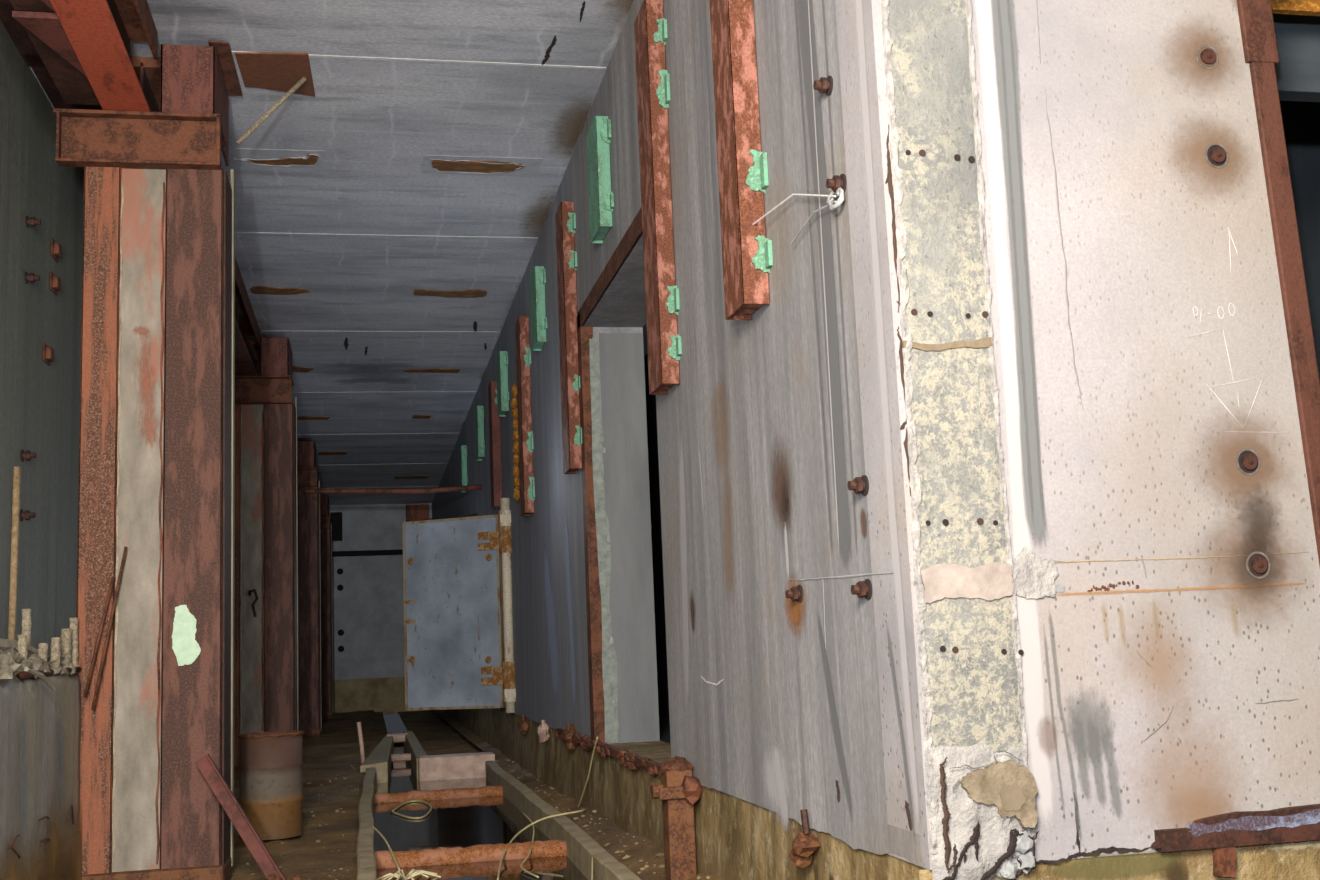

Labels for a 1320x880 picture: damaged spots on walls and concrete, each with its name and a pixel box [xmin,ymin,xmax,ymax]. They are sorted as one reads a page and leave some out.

corrosion [1182,35,1219,76]
peeling [421,155,543,177]
corrosion [1183,134,1236,179]
corrosion [134,327,155,442]
spalling [673,0,1038,867]
corrosion [1218,440,1272,494]
corrosion [1061,505,1301,601]
crack [939,750,1151,880]